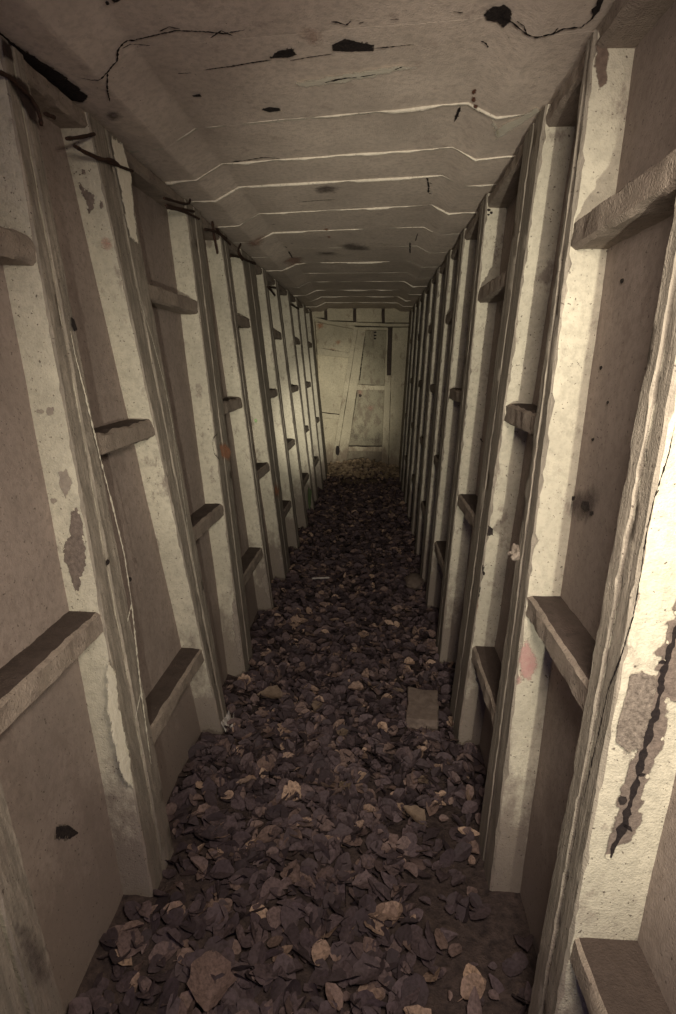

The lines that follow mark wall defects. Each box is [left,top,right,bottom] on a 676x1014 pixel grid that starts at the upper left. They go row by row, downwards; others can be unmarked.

crack [83,27,243,101]
crack [178,54,331,74]
spalling [270,48,297,59]
spalling [332,39,374,52]
crack [325,44,414,83]
crack [501,0,603,38]
peeling [62,508,86,595]
crack [582,426,675,805]
peeling [605,602,676,860]
crack [610,626,676,858]